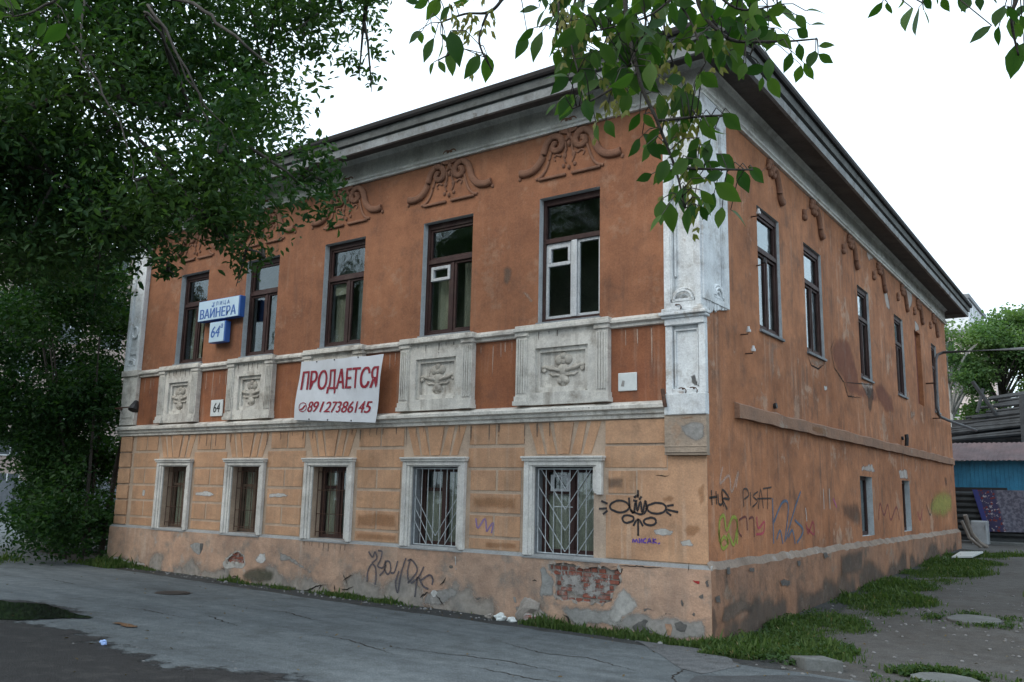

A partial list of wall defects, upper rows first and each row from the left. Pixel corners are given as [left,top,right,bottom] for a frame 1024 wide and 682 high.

peeling [113,543,329,592]
flaking render [548,562,704,639]